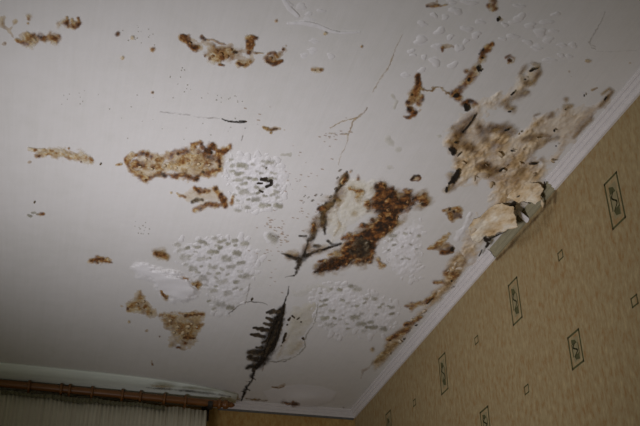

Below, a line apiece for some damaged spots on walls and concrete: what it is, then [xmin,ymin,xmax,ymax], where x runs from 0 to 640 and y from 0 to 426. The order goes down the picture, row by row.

rust [0,16,60,47]
rust [62,17,81,29]
rust [178,35,284,68]
rust [486,0,503,22]
rust [403,42,495,119]
rust [27,148,101,165]
rust [115,141,234,212]
peeling [442,63,613,214]
rust [313,182,430,275]
crack [283,224,323,304]
water stain [250,309,281,349]